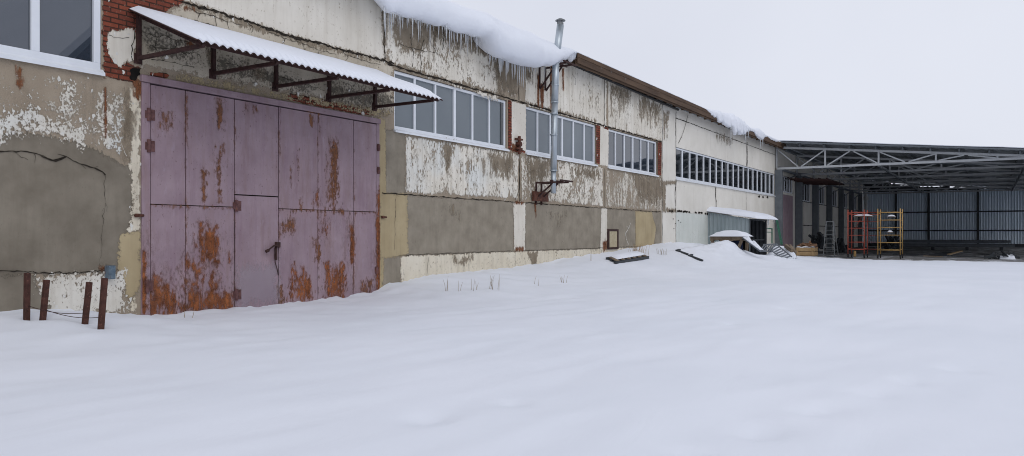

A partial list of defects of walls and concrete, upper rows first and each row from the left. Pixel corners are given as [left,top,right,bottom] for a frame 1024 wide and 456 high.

leakage [192,6,596,125]
peeling [0,0,708,232]
leakage [611,85,670,139]
crack [0,151,106,274]
corrosion [202,144,230,209]
corrosion [277,104,380,304]
leakage [441,137,456,173]
leakage [482,149,514,180]
leakage [572,164,603,181]
leakage [632,173,662,206]
peeling [33,267,137,314]
corrosion [142,203,235,316]